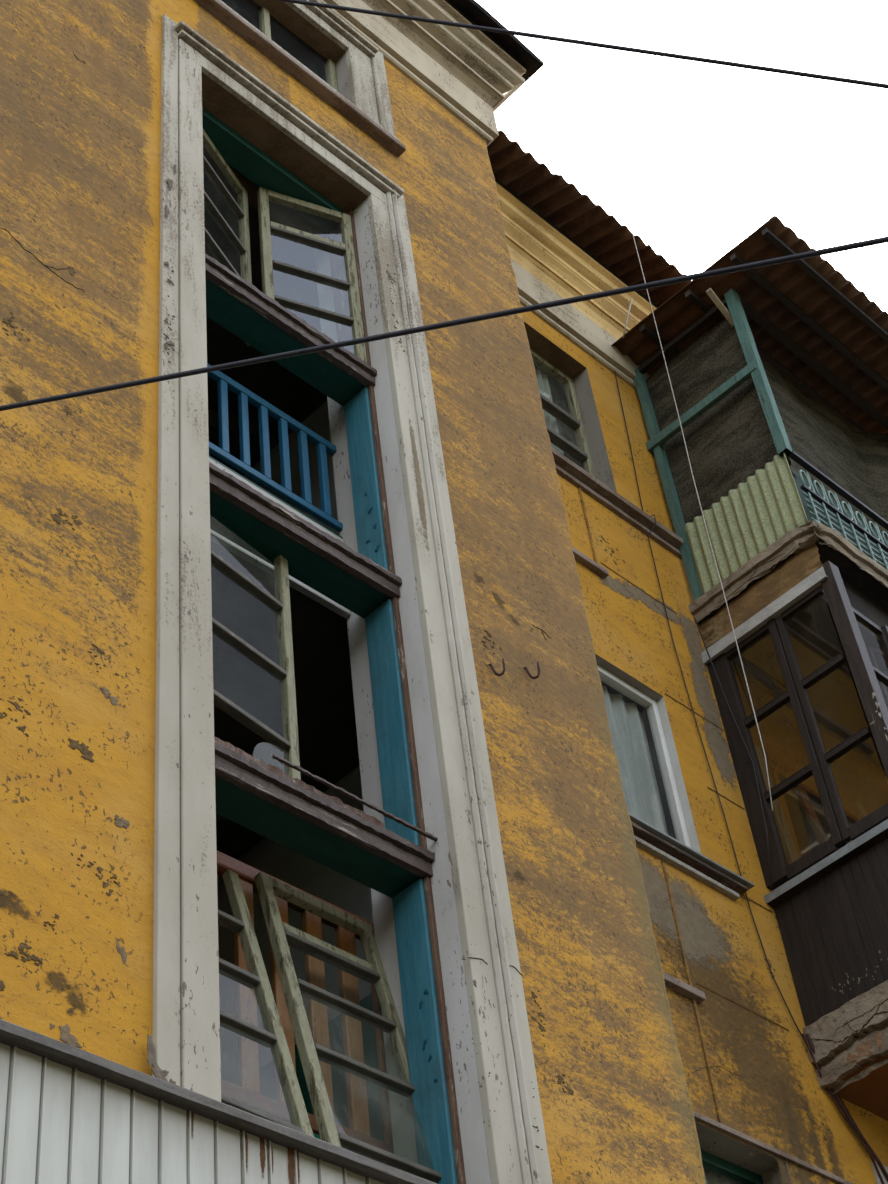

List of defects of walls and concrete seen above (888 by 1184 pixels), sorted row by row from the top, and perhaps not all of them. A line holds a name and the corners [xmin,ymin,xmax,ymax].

crack [0,227,85,292]
peeling [99,687,118,706]
peeling [0,685,31,737]
peeling [68,737,95,762]
flaking render [114,814,130,829]
peeling [71,853,118,897]
peeling [7,942,43,966]
flaking render [116,939,127,965]
peeling [531,980,546,1047]
crack [811,999,888,1043]
peeling [50,1023,82,1048]